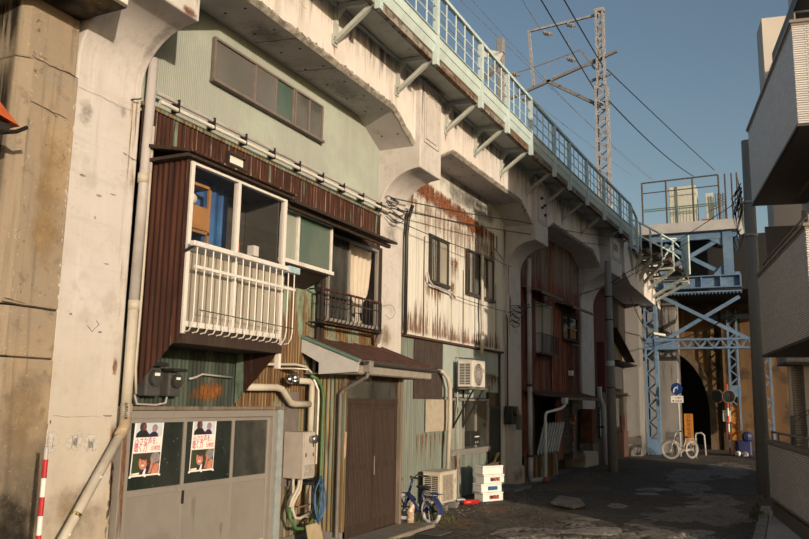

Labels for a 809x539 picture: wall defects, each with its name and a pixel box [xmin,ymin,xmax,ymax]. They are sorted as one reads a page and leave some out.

leakage [0,0,20,39]
leakage [350,31,387,69]
crack [32,55,135,112]
corrosion [405,184,511,312]
corrosion [407,308,499,348]
corrosion [196,384,222,401]